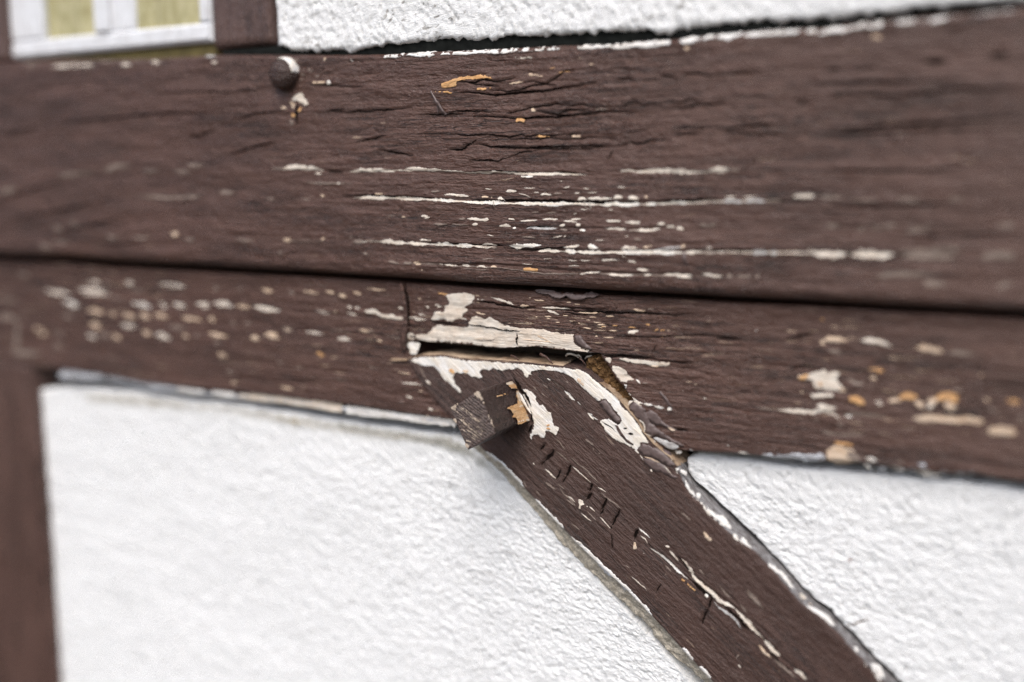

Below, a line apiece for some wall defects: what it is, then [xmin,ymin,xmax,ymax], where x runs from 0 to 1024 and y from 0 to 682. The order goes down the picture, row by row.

peeling [384,46,560,59]
peeling [578,15,958,65]
crack [791,59,1015,102]
crack [317,67,1024,174]
crack [405,285,745,363]
crack [786,332,815,340]
peeling [45,280,751,548]
peeling [758,368,1024,476]
crack [540,445,638,548]
peeling [536,499,652,615]
peeling [768,563,835,626]
peeling [865,663,885,682]